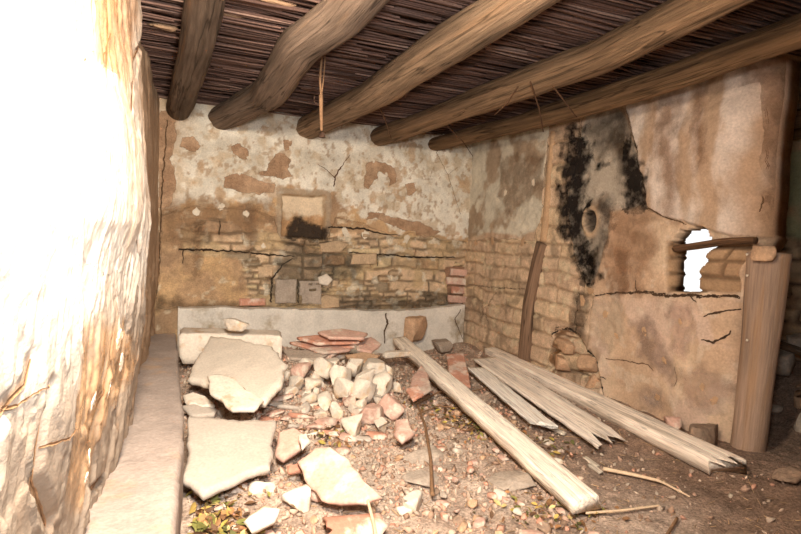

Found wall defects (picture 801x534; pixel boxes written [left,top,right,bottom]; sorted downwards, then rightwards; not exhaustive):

damp [620,137,648,213]
flaking render [156,111,601,389]
crack [328,226,455,266]
crack [0,359,50,416]
crack [552,280,742,395]
crack [30,381,105,527]